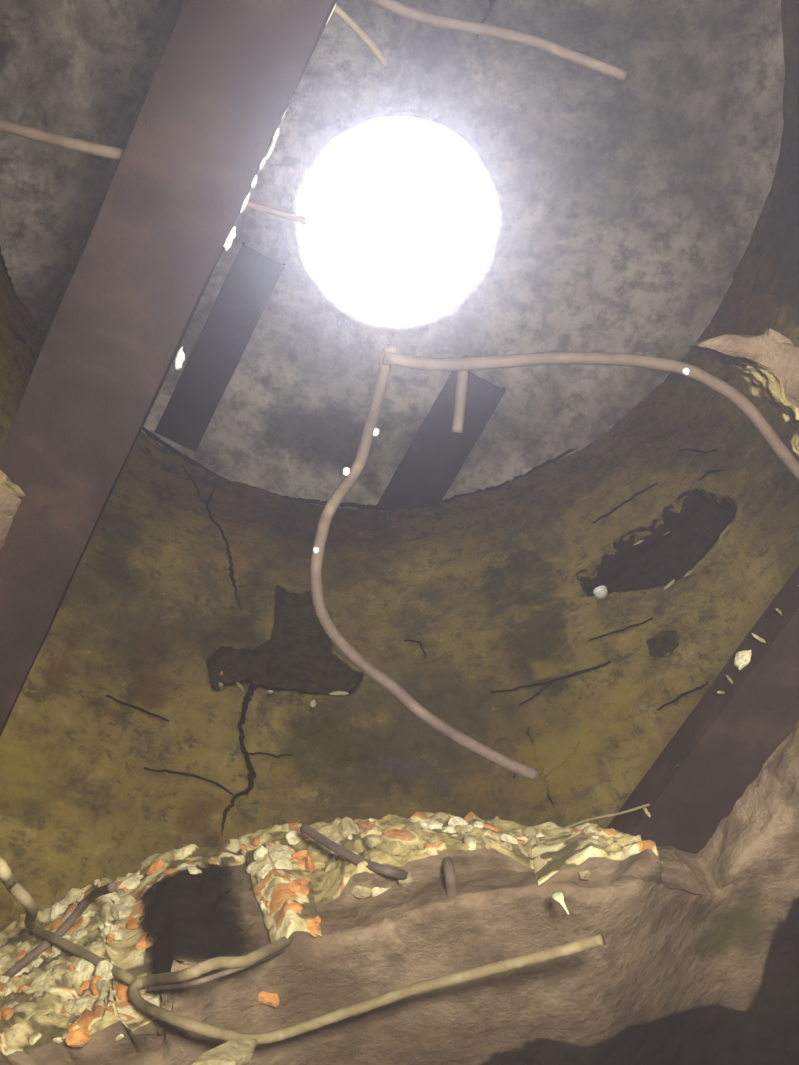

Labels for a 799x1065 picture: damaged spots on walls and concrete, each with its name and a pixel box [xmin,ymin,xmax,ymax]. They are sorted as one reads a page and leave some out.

spalling [764,329,793,345]
crack [142,426,242,611]
flaking render [207,344,799,781]
crack [591,483,658,523]
crack [106,695,169,722]
crack [144,663,304,834]
crack [491,617,653,805]
spalling [0,811,662,1065]